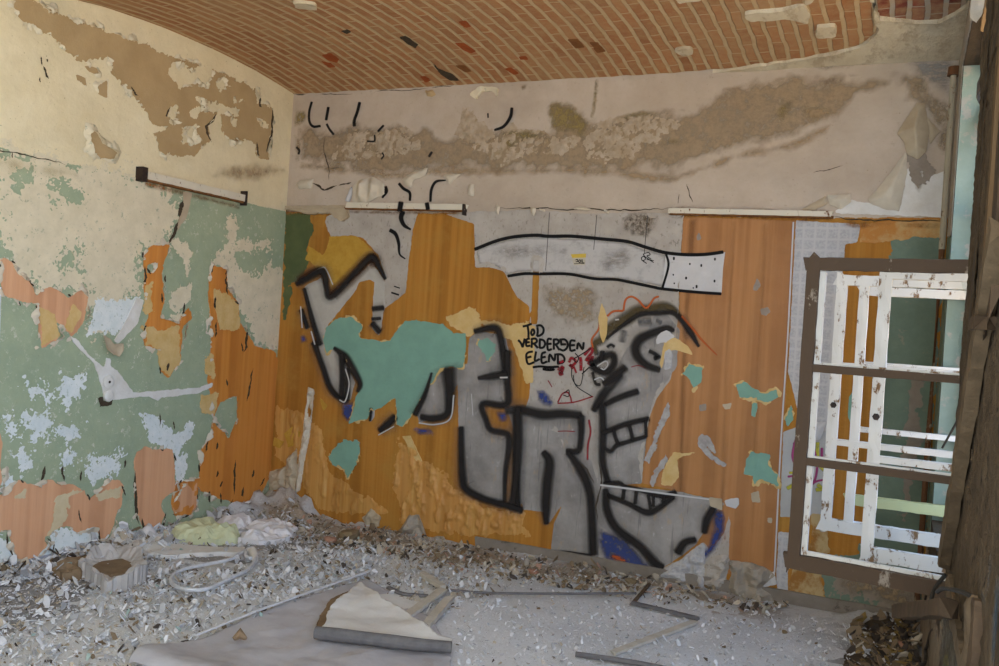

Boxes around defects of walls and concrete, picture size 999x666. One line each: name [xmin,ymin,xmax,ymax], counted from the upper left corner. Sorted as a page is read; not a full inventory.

peeling [7,0,276,161]
flaking render [79,0,966,100]
leakage [295,77,885,181]
peeling [0,122,193,357]
peeling [211,213,283,350]
flaking render [956,0,999,429]
peeling [0,366,128,501]
peeling [38,527,100,557]
peeling [139,413,200,485]
peeling [295,387,315,493]
flaking render [900,380,925,522]
flaking render [920,298,999,666]